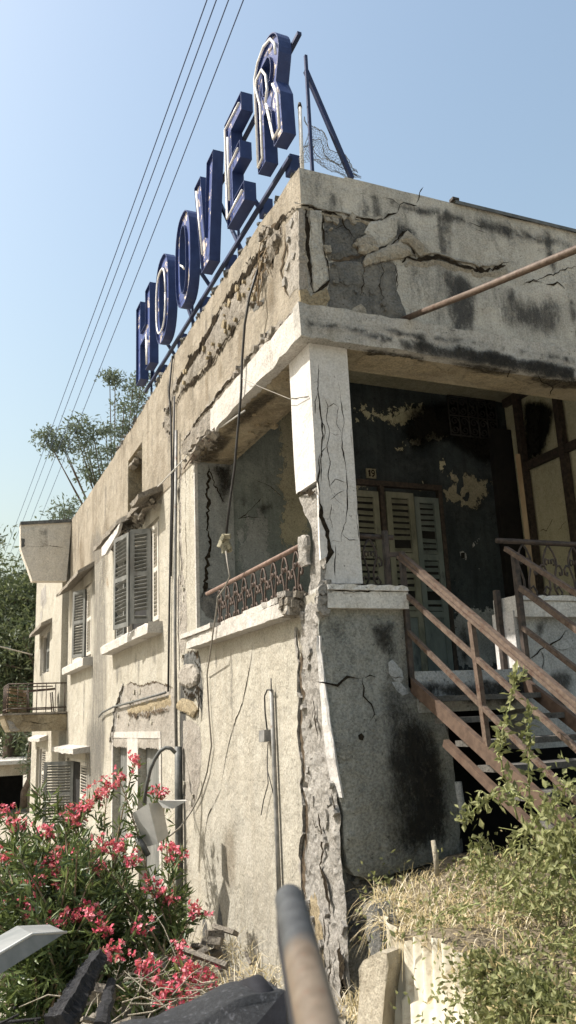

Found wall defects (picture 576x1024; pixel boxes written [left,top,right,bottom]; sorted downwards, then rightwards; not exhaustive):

leakage [341,197,380,264]
leakage [405,207,463,253]
leakage [480,221,555,270]
leakage [309,273,576,389]
flaking render [463,372,534,389]
crack [164,188,574,719]
peeling [439,458,490,511]
flaking render [113,208,443,1018]
crack [294,627,375,1005]
leakage [389,704,447,848]